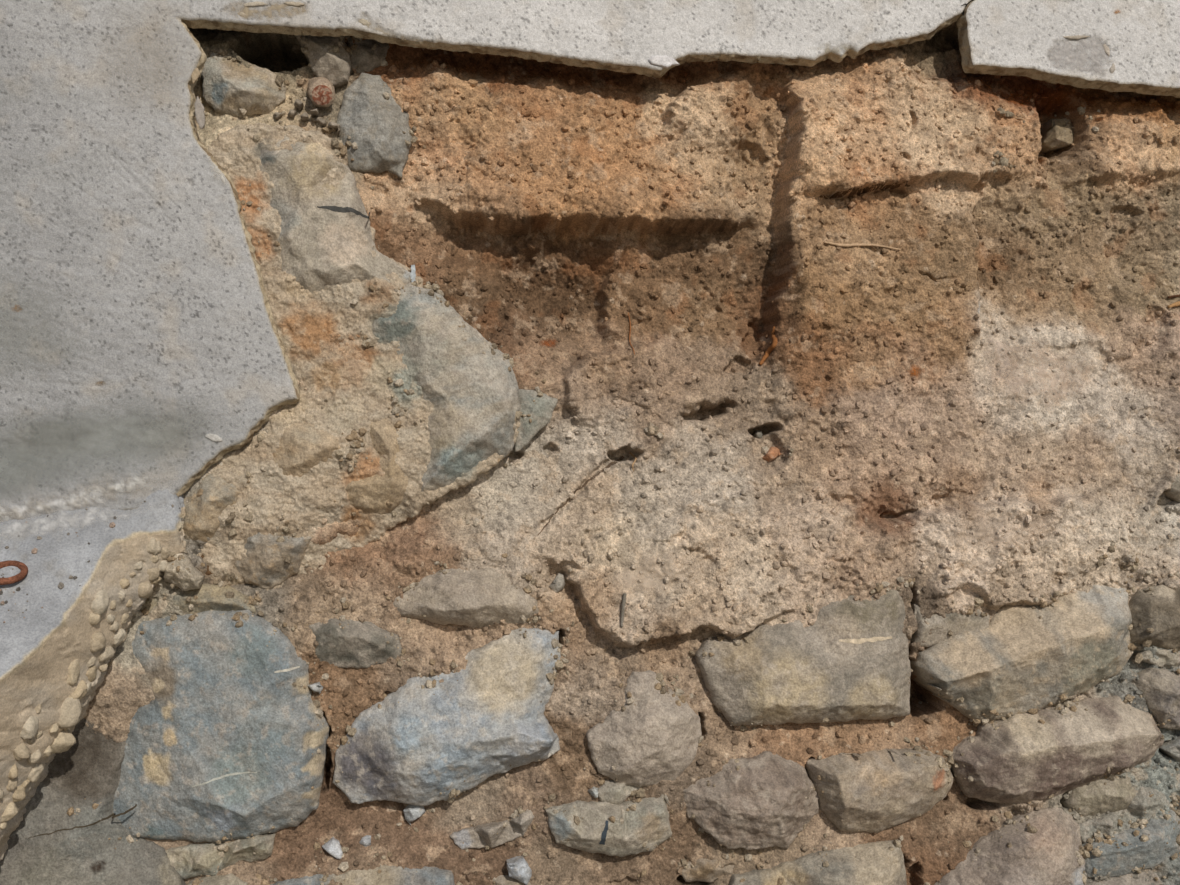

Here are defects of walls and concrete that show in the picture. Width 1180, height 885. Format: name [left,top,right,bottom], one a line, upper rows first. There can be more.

peeling [649,55,680,68]
flaking render [1049,35,1115,74]
peeling [191,68,205,129]
spalling [317,206,370,219]
spalling [549,573,565,593]
spalling [839,636,892,644]
spalling [308,682,323,694]
spalling [403,804,425,825]
spalling [322,836,343,859]
spalling [359,835,371,847]
spalling [599,820,608,845]
spalling [506,855,532,885]